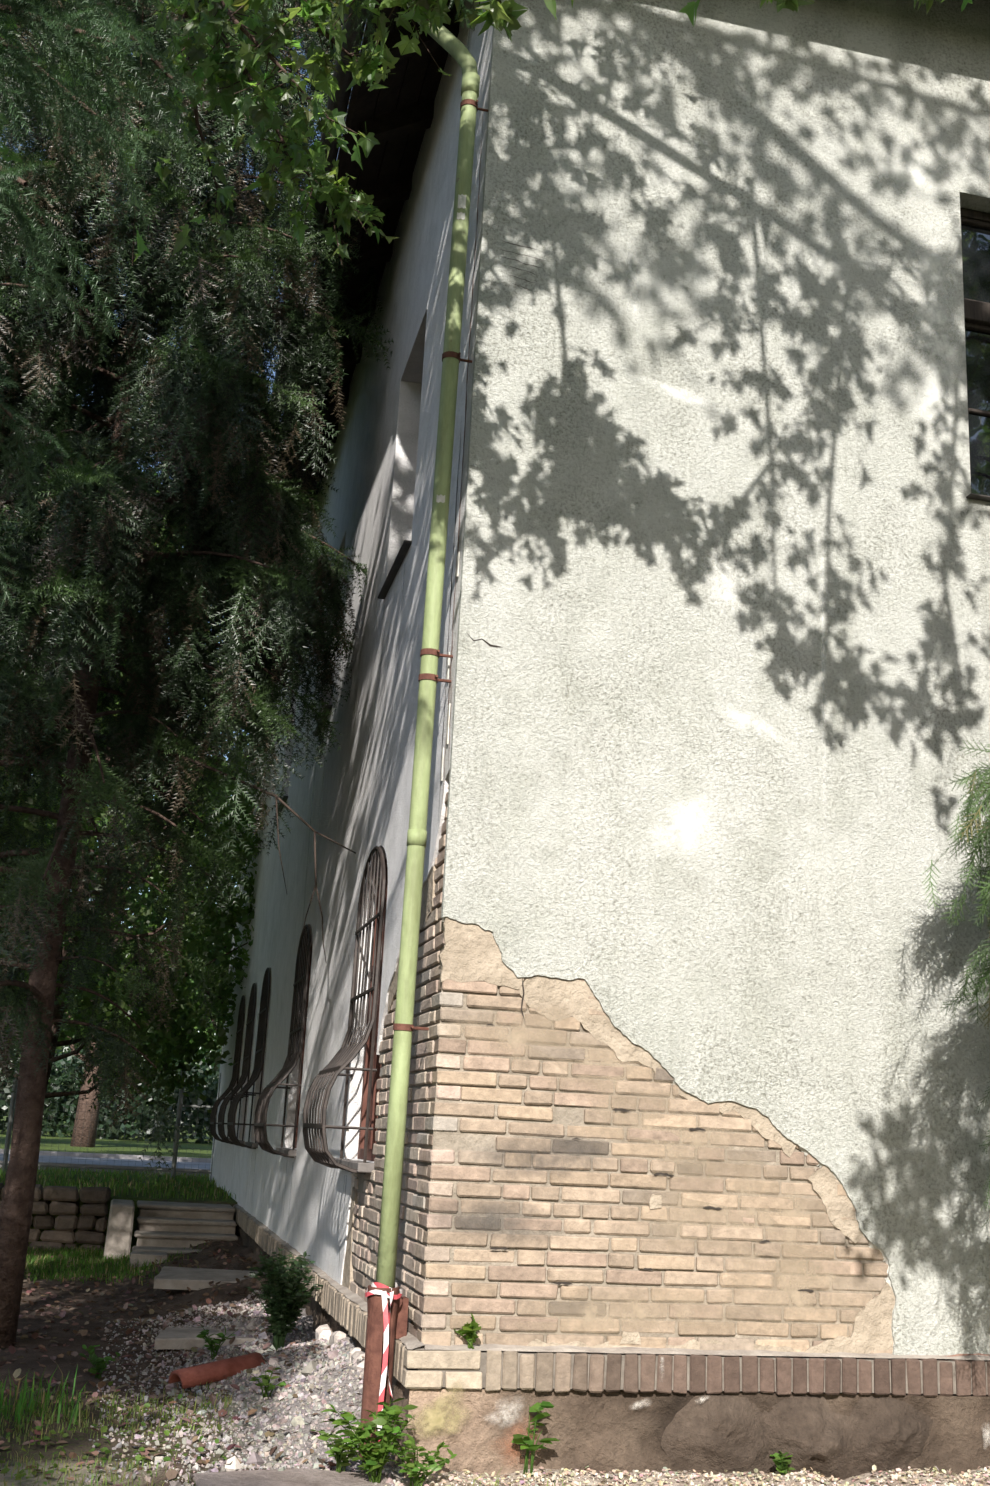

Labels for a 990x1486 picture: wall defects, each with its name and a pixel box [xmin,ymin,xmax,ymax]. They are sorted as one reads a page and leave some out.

flaking render [342,960,399,1302]
flaking render [395,785,895,1358]